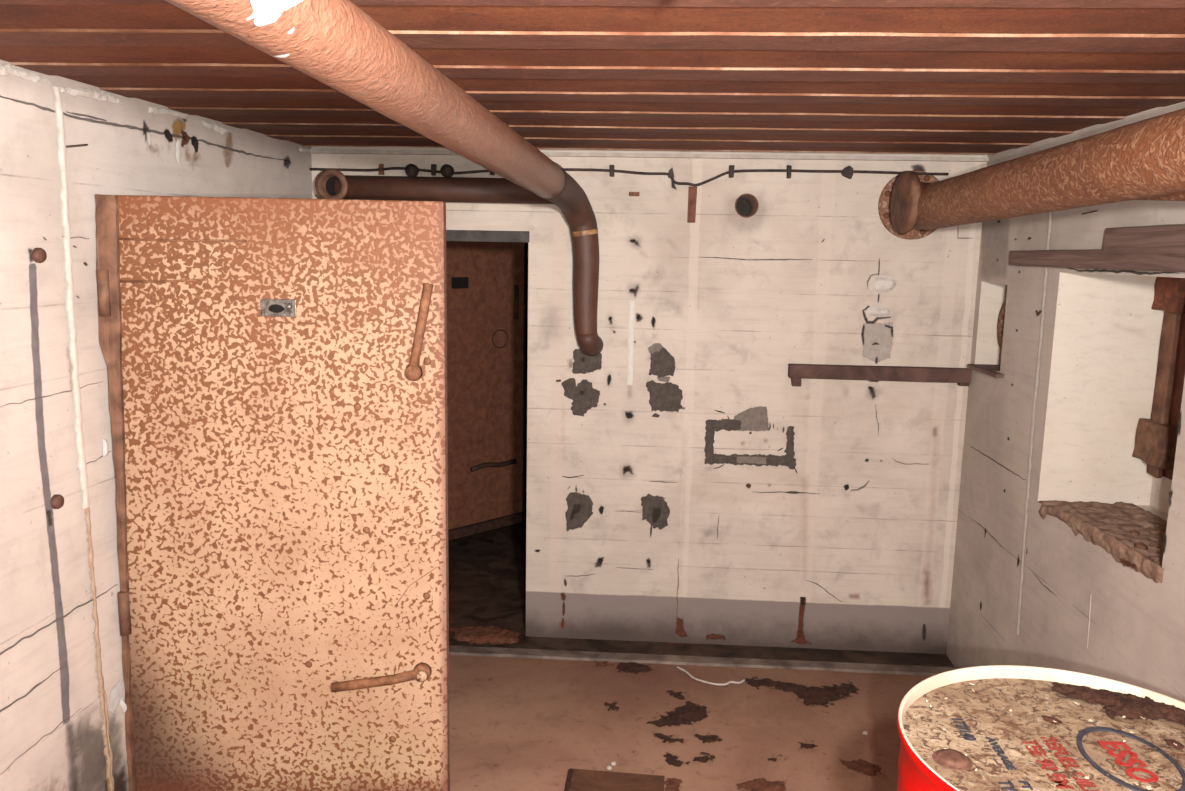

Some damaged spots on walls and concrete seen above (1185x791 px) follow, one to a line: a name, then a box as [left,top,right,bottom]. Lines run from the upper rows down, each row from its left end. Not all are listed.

spalling [556,348,611,417]
spalling [634,341,685,417]
spalling [565,487,604,531]
spalling [641,494,670,537]
rust [793,597,810,644]